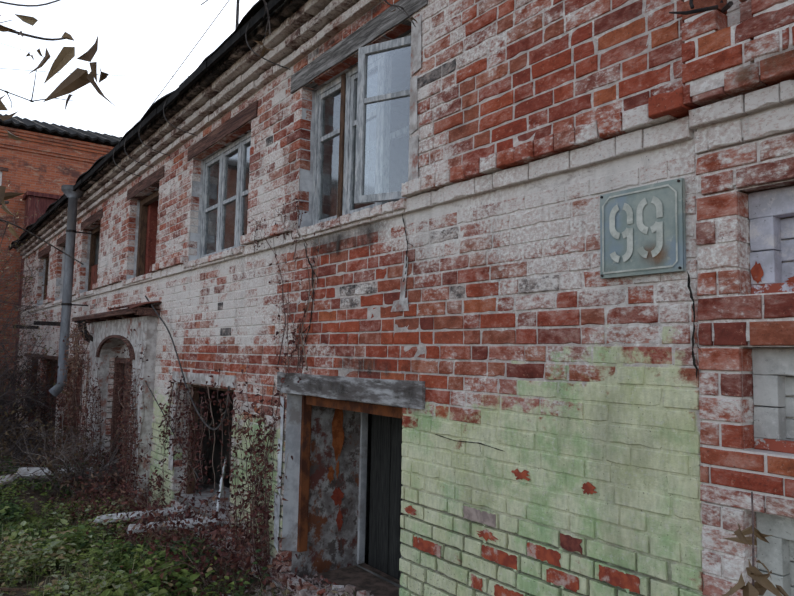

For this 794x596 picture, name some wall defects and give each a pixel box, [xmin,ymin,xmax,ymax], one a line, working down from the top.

crack [687,272,701,378]
peeling [471,574,483,591]
peeling [463,506,517,572]
peeling [494,584,523,596]
peeling [527,533,582,592]
peeling [599,564,640,594]